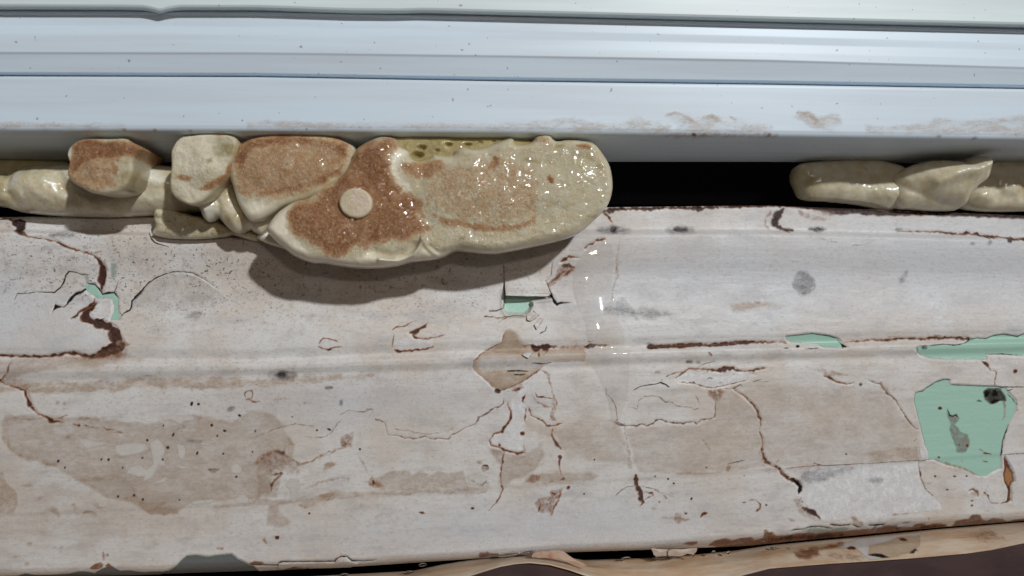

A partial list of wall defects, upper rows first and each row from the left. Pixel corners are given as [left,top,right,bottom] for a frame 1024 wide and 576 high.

peeling [86,276,121,320]
crack [0,218,213,423]
peeling [490,266,570,334]
crack [647,340,786,356]
peeling [786,333,847,349]
crack [849,334,970,342]
peeling [916,334,1024,360]
leakage [79,439,187,484]
crack [529,372,562,471]
crack [621,474,653,505]
crack [734,389,926,558]
peeling [914,379,1018,502]